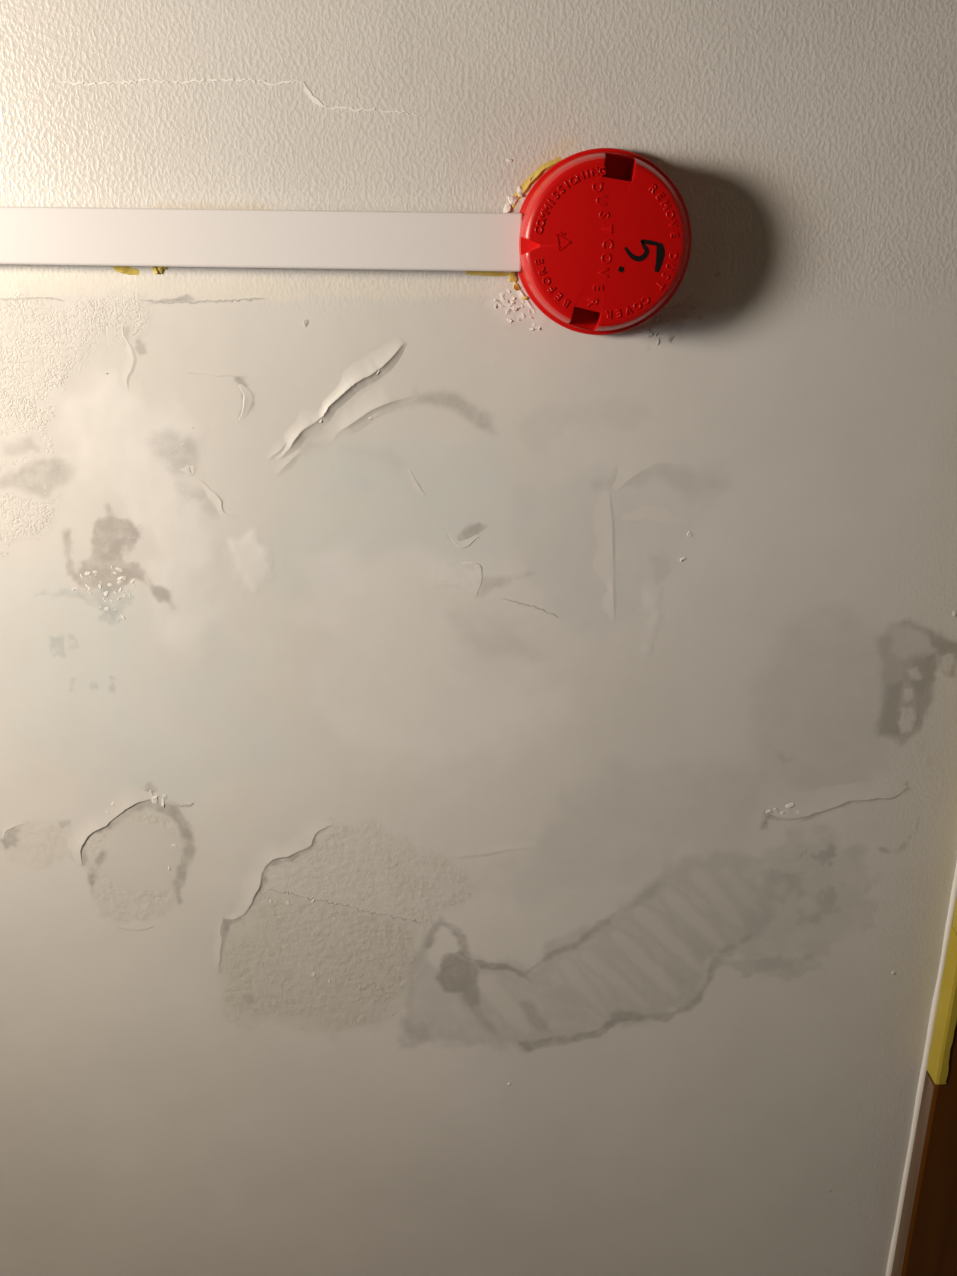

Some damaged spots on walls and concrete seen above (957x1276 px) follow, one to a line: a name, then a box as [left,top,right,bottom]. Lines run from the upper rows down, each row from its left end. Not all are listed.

water stain [139,424,237,524]
water stain [368,382,678,463]
spalling [67,779,203,936]
water stain [391,591,957,1058]